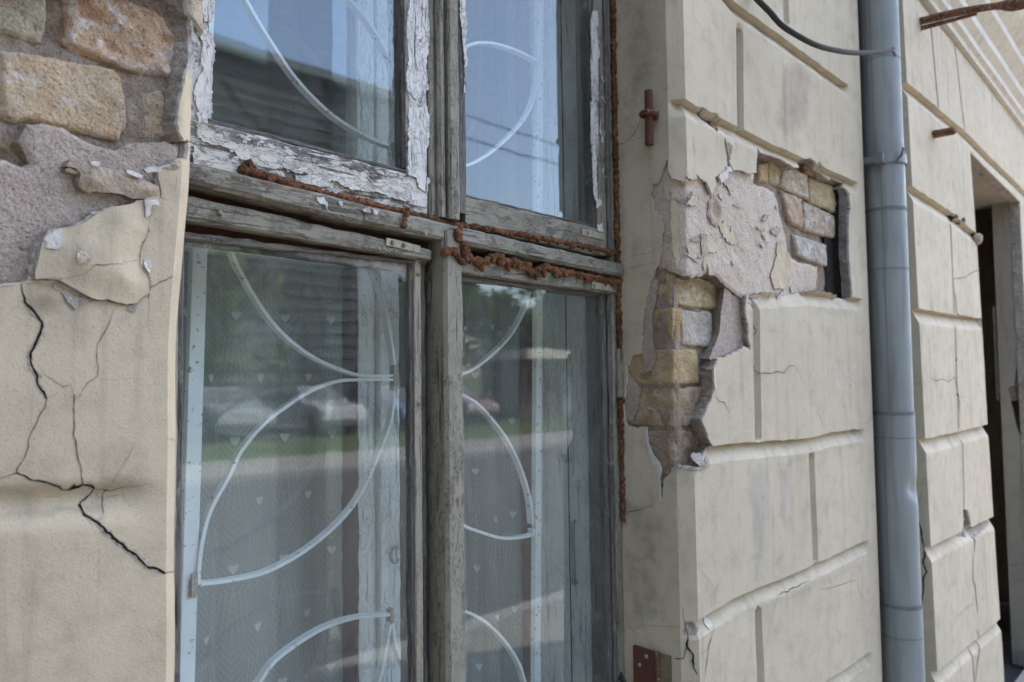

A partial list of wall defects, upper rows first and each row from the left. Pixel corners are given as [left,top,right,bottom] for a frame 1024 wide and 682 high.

spalling [0,0,180,310]
crack [1,172,178,574]
spalling [624,119,850,503]
crack [628,565,719,675]
crack [918,492,928,603]